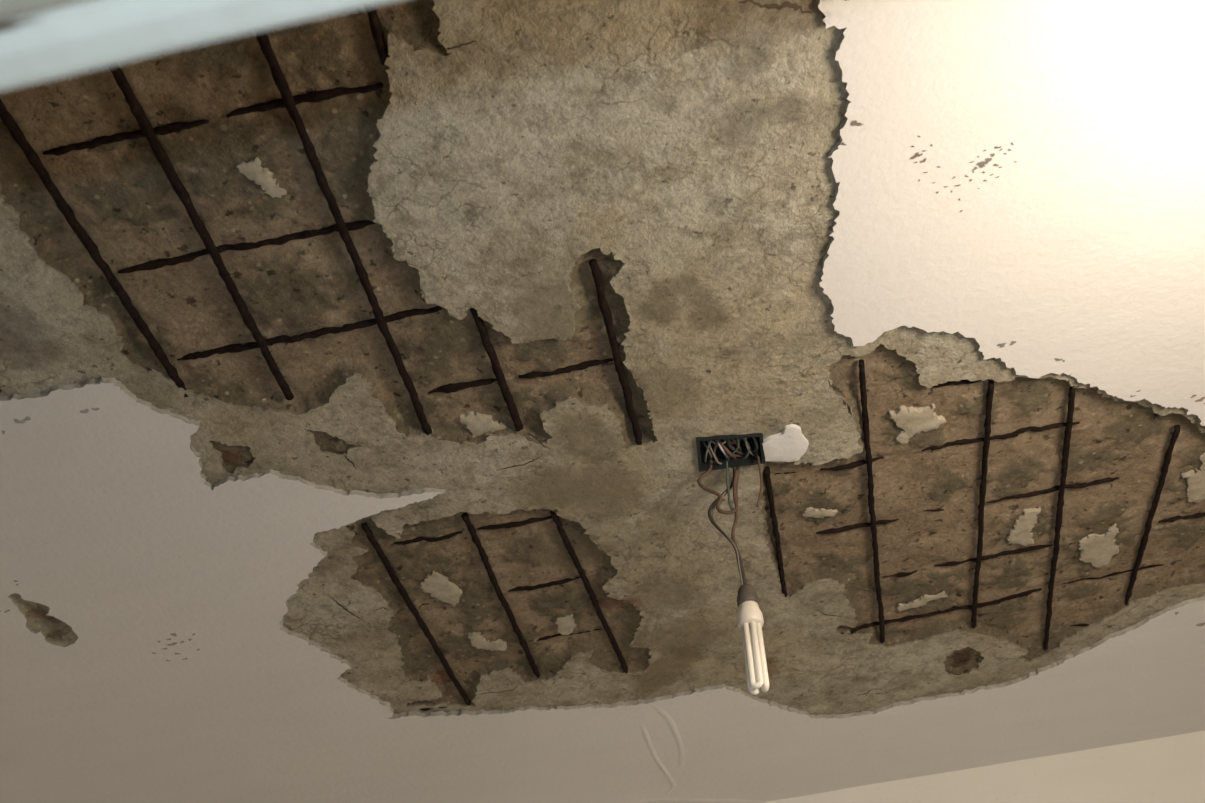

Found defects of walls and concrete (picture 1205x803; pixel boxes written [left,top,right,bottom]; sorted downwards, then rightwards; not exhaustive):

corrosion [0,20,31,31]
spalling [118,32,336,247]
spalling [265,8,392,223]
spalling [375,0,451,56]
spalling [0,67,438,437]
spalling [209,441,256,475]
spalling [306,430,362,456]
spalling [387,248,658,451]
spalling [760,343,1205,663]
spalling [7,593,78,647]
spalling [345,508,651,708]
spalling [943,647,984,677]